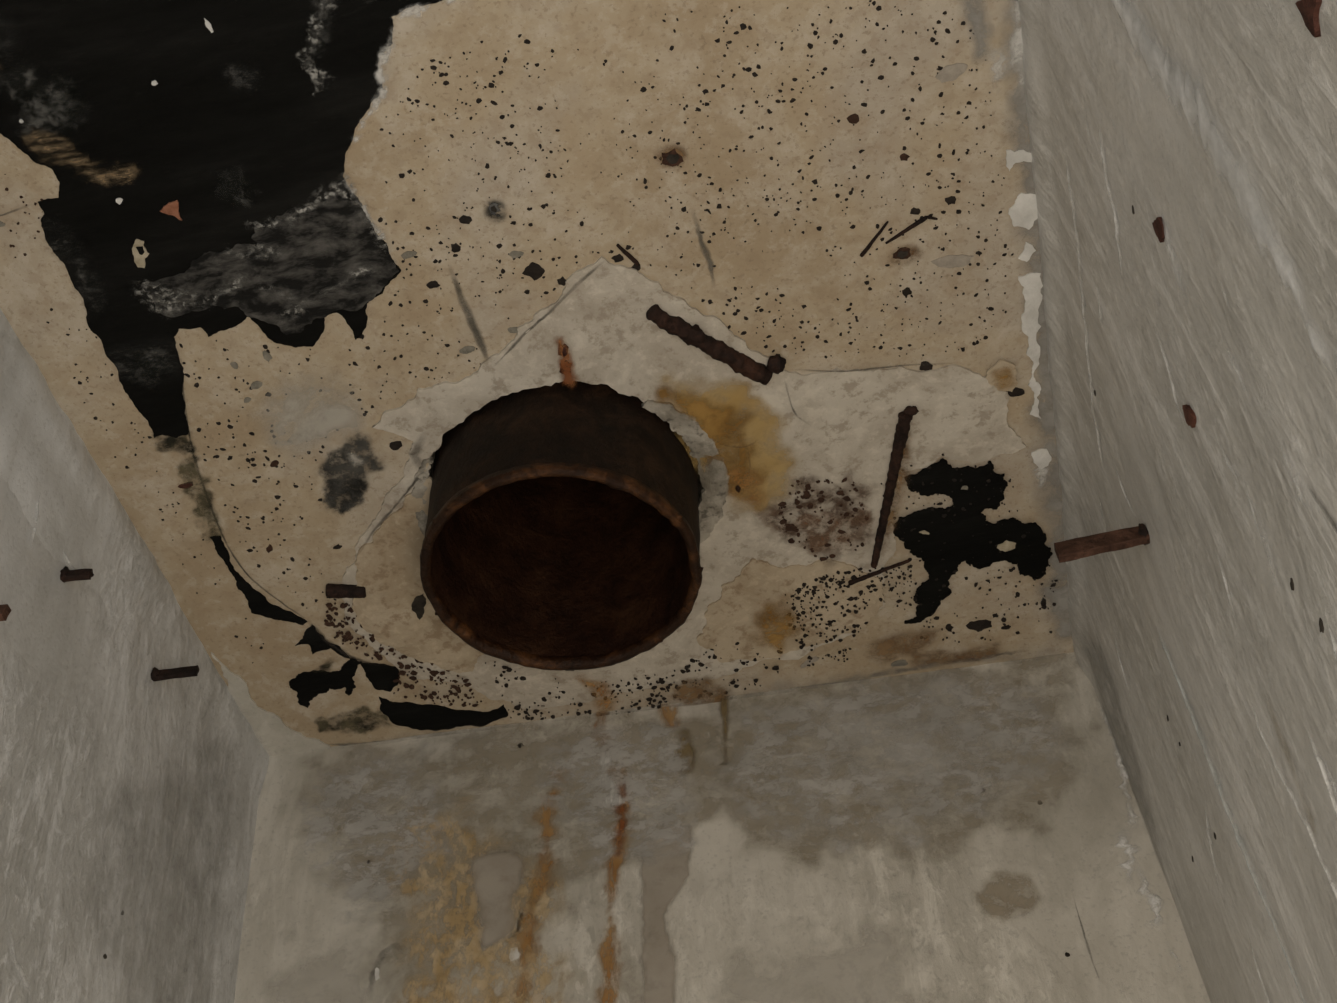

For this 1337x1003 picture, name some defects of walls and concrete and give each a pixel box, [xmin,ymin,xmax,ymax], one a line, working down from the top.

rust [1295,0,1322,38]
leakage [1011,45,1035,194]
spalling [132,239,149,268]
rust [616,244,639,266]
peeling [985,193,1043,419]
rust [646,304,793,511]
leakage [769,478,872,561]
rust [871,406,919,568]
peeling [997,540,1016,552]
leakage [1026,218,1072,637]
peeling [295,625,400,692]
leakage [321,633,1071,981]